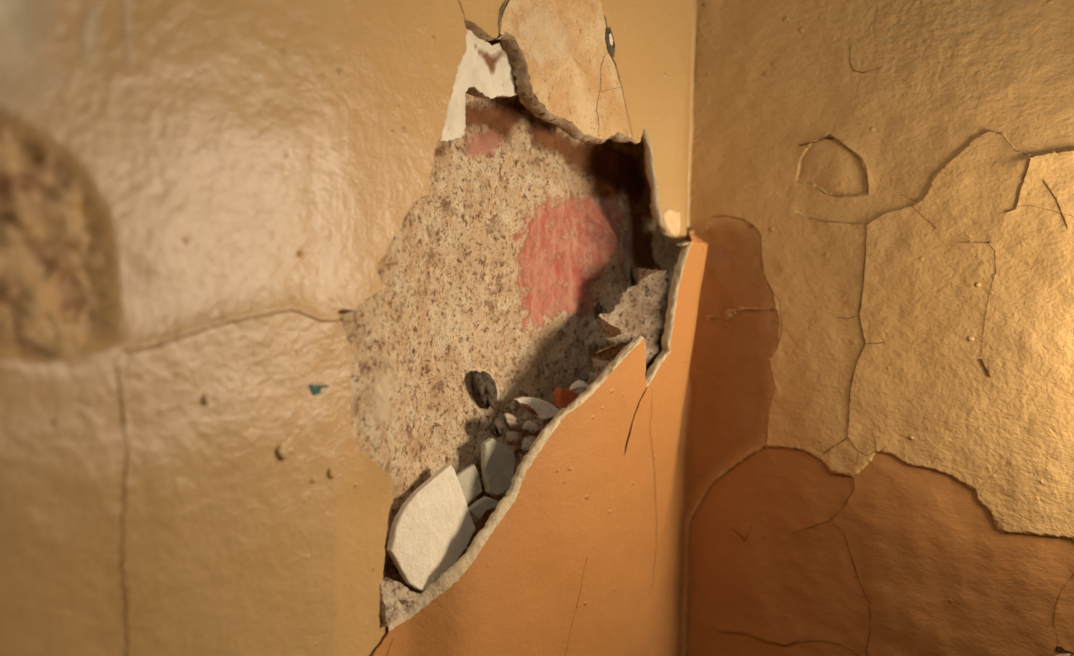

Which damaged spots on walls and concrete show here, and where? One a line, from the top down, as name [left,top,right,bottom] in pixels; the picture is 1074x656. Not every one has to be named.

crack [114,310,333,656]
spalling [338,0,686,593]
peeling [686,447,1074,656]
crack [726,130,1074,656]